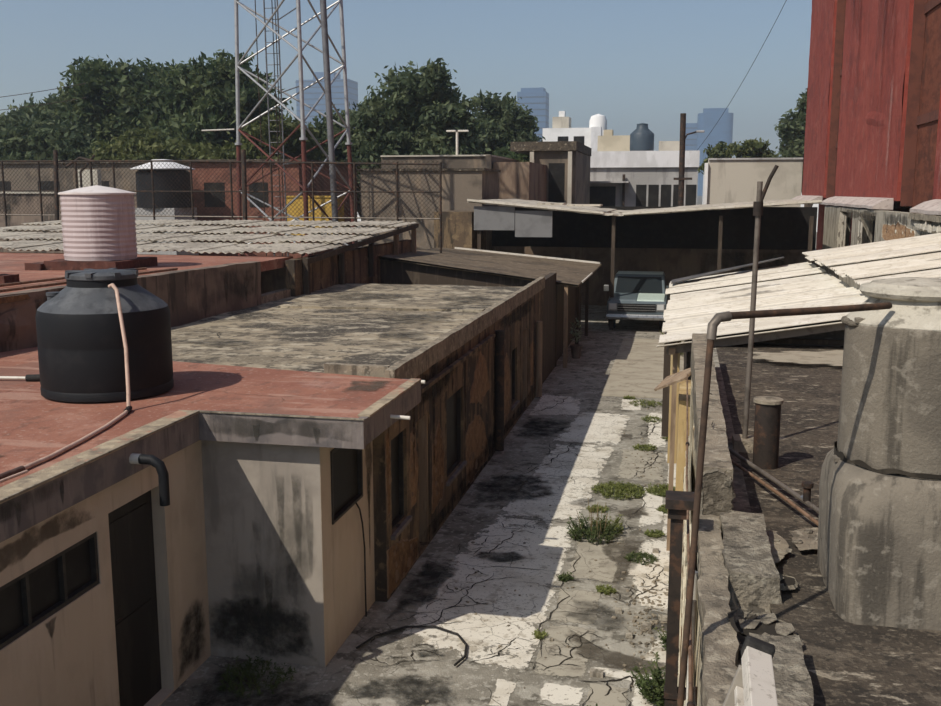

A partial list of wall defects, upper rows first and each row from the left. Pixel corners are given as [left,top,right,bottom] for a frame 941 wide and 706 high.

crack [501,442,589,484]
crack [625,420,662,530]
spalling [700,469,736,517]
water stain [0,517,82,572]
spalling [779,573,798,590]
water stain [180,600,304,676]
crack [371,516,669,706]
crack [727,589,747,638]